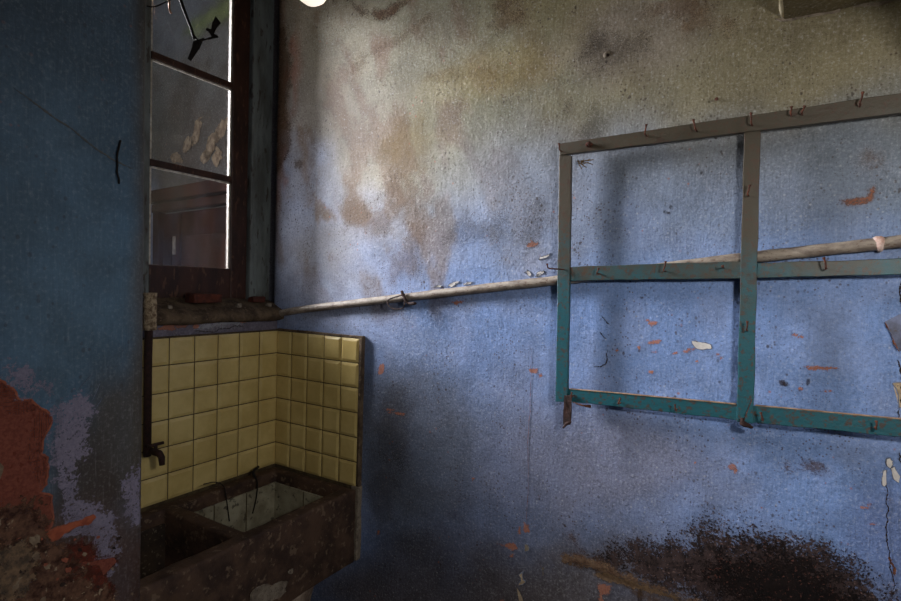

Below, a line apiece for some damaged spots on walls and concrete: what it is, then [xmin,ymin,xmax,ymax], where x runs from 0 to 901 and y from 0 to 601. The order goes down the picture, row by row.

water stain [350,0,407,20]
peeling [673,340,722,363]
crack [885,283,901,418]
water stain [561,504,899,601]
crack [881,453,901,593]